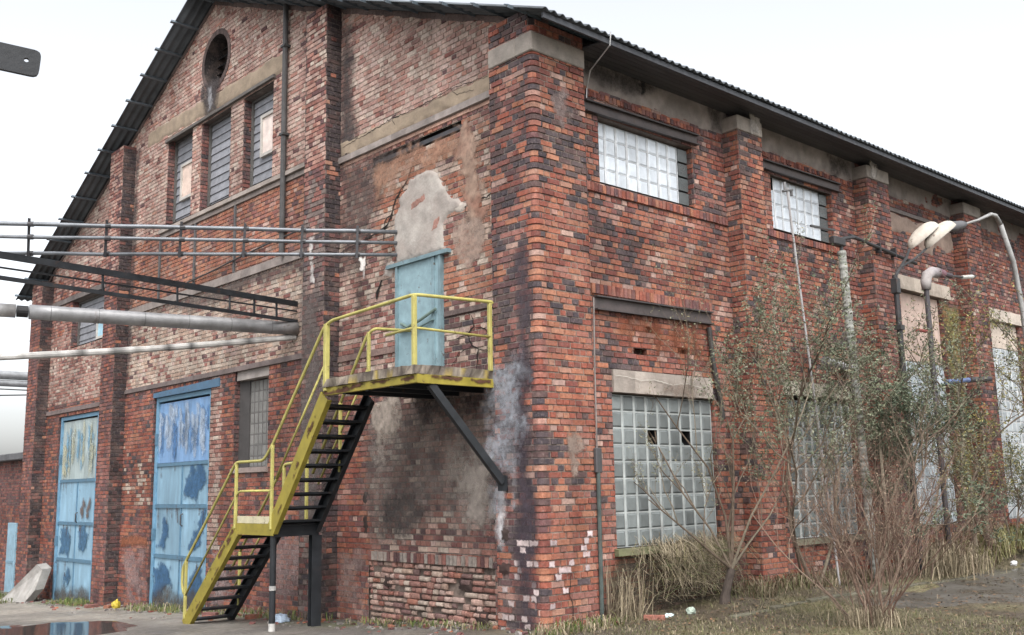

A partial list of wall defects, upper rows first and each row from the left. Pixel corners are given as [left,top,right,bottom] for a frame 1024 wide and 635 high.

leakage [201,79,219,116]
crack [340,167,412,253]
flaking render [373,119,491,268]